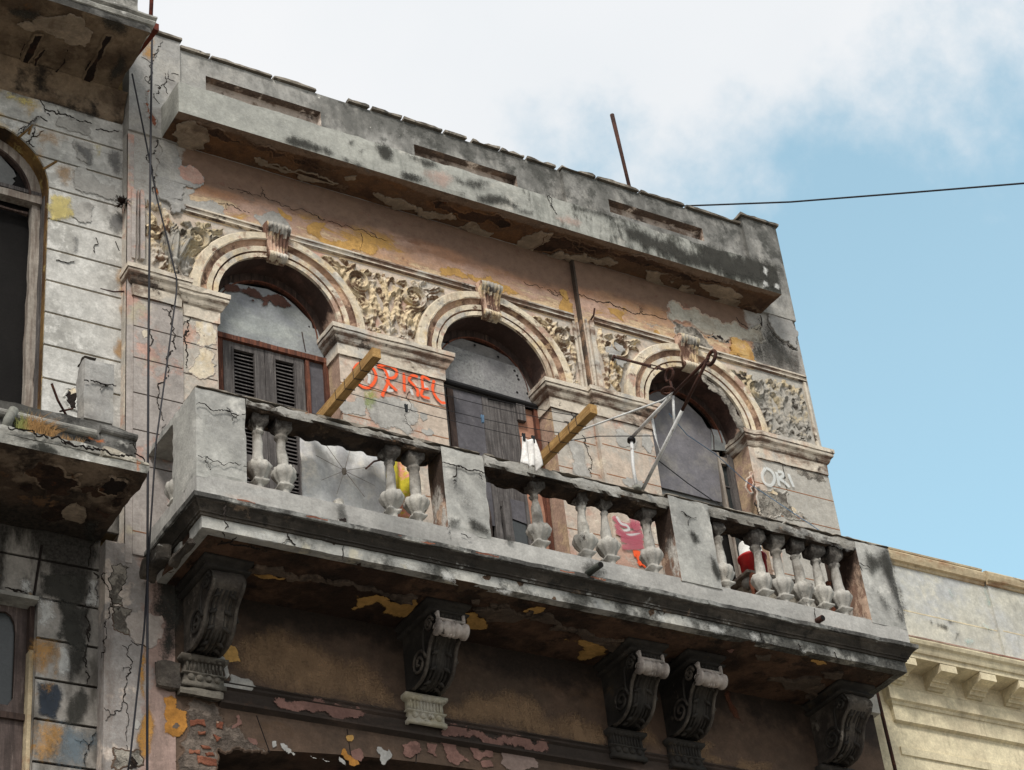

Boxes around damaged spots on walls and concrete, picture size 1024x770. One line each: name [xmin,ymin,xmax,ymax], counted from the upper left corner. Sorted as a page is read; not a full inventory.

crack [17,100,119,147]
flaking render [143,89,357,215]
damp [377,143,393,161]
damp [576,207,781,293]
flaking render [515,231,766,361]
crack [150,305,191,427]
crack [196,402,248,421]
damp [866,550,905,621]
crack [83,543,146,763]
damp [66,687,89,724]
flaking render [164,645,295,770]
peeling [377,723,549,770]